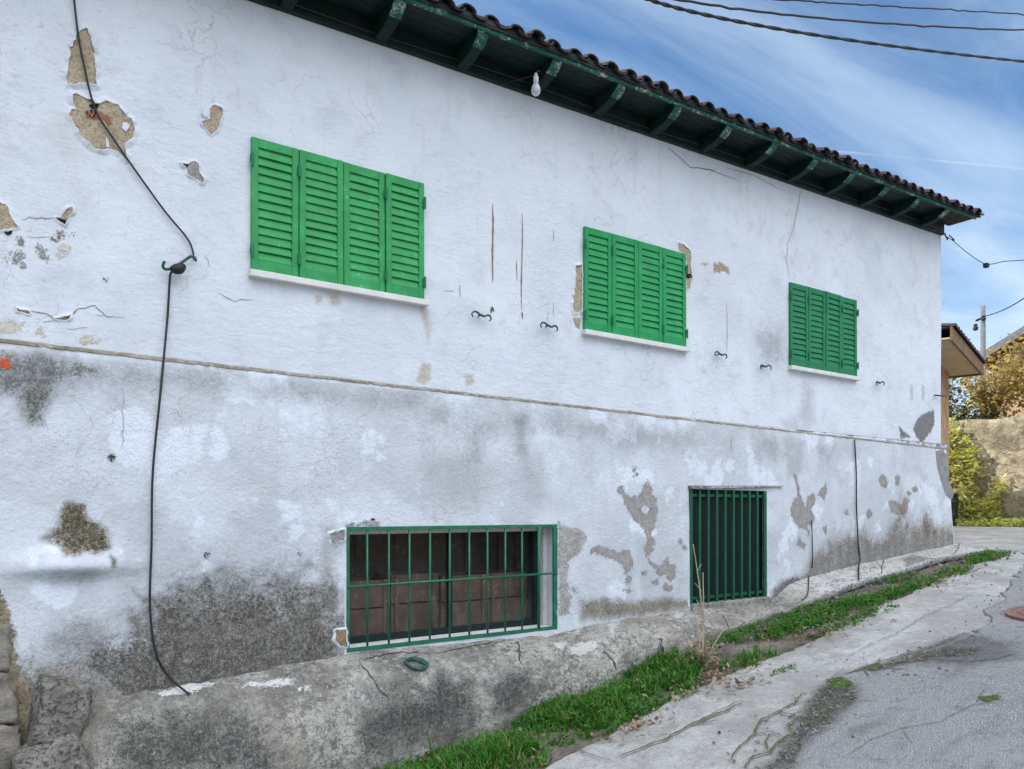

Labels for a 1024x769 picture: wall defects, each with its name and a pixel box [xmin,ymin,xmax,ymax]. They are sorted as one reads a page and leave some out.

spalling [60,23,140,165]
spalling [199,102,226,138]
crack [668,147,802,267]
crack [22,305,126,330]
spalling [570,261,584,329]
spalling [676,240,729,292]
water stain [0,349,97,425]
spalling [46,503,115,565]
peeling [557,466,676,616]
peeling [790,473,828,549]
peeling [879,473,918,515]
water stain [57,566,345,769]